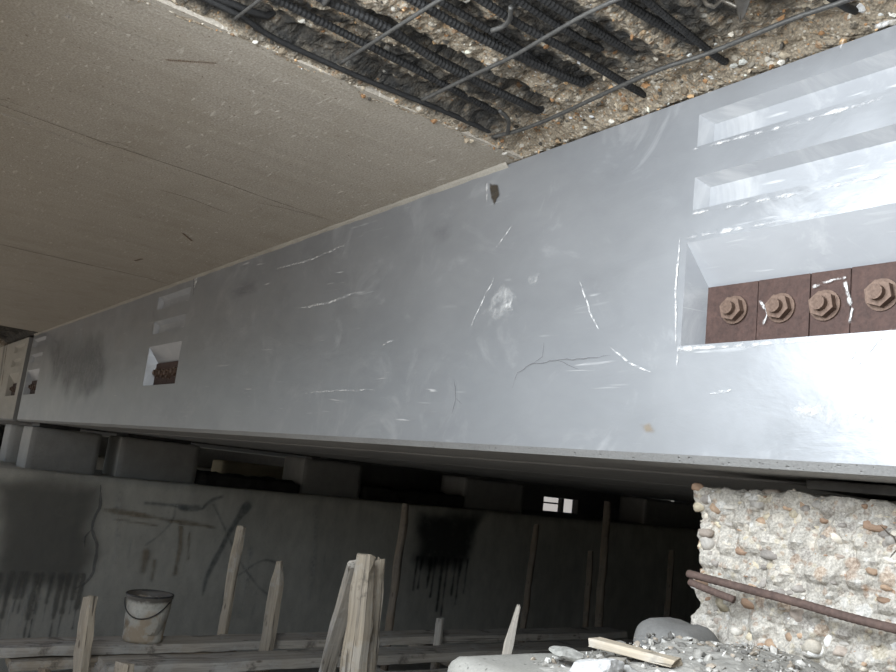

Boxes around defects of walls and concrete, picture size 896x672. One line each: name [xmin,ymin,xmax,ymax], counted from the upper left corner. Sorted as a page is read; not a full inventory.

spalling [168,0,896,162]
crack [512,346,606,388]
leakage [0,485,92,638]
leakage [413,515,480,614]
rust [686,570,896,634]
crack [880,525,896,558]